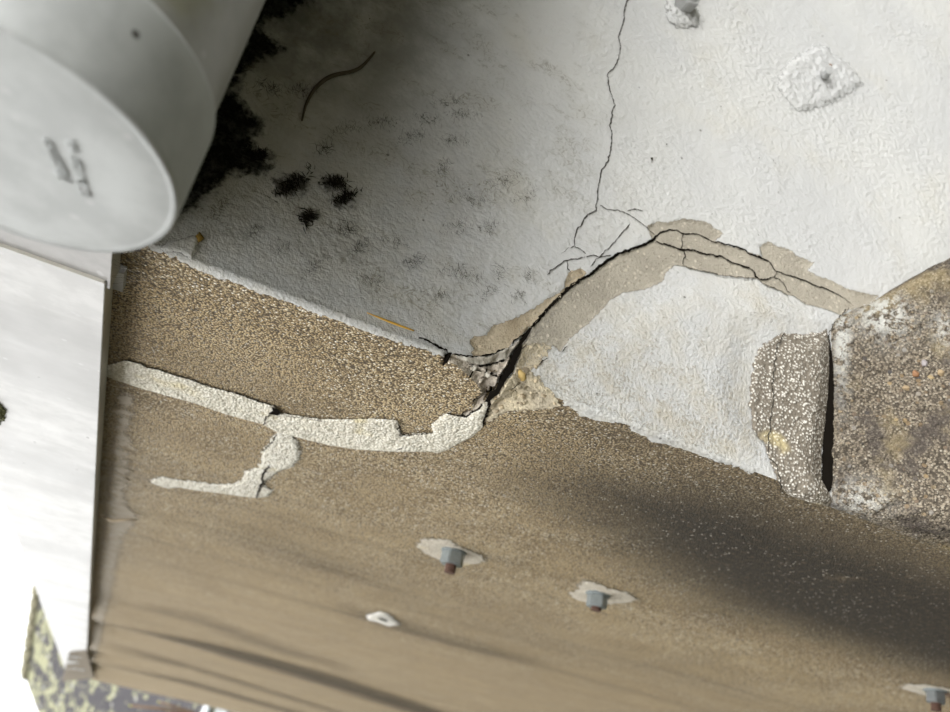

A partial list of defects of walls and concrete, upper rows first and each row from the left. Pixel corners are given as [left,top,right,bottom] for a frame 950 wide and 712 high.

water stain [180,0,379,256]
crack [483,0,853,426]
crack [443,352,452,365]
peeling [419,218,878,422]
crack [767,332,788,496]